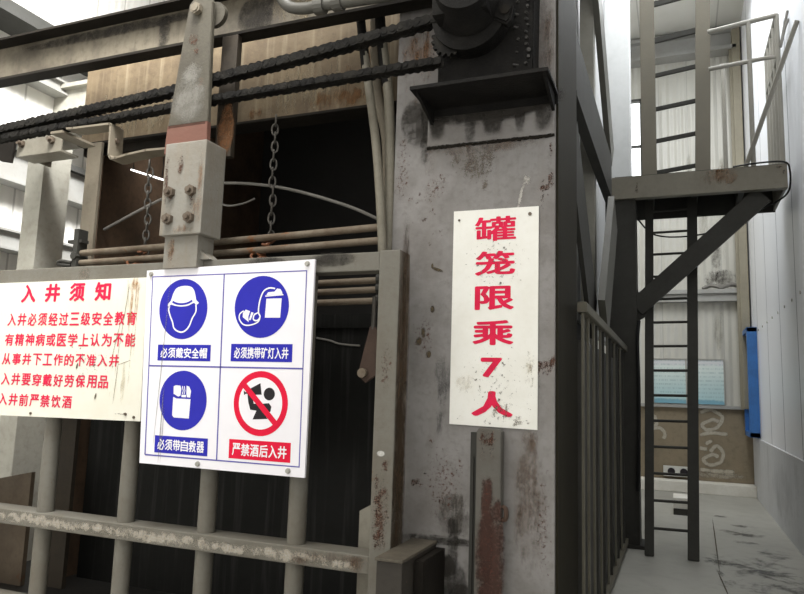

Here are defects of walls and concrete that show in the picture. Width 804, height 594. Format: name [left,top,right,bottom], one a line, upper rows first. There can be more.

leakage [421,111,445,161]
leakage [483,110,502,132]
corrosion [371,228,467,548]
corrosion [476,479,504,594]